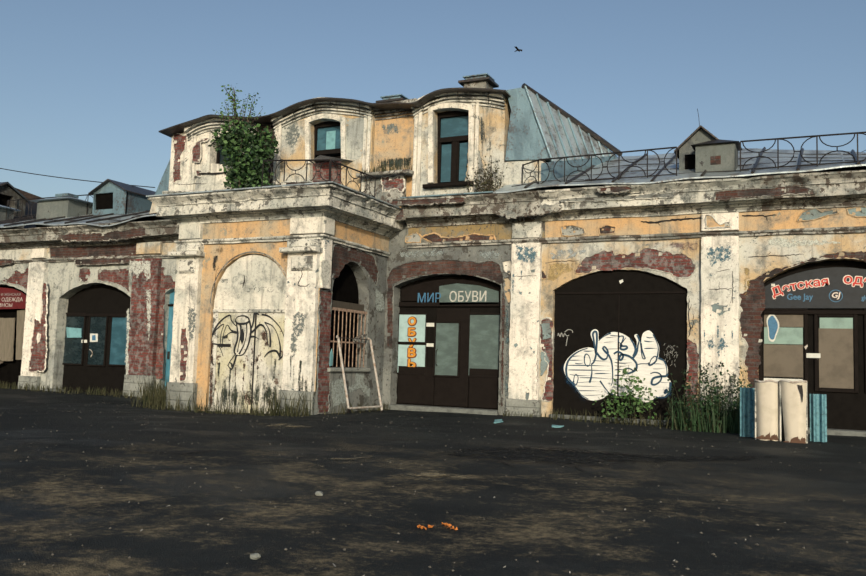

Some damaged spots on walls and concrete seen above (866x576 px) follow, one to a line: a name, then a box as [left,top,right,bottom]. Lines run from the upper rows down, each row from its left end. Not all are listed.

flaking render [172,133,209,184]
flaking render [2,266,29,290]
flaking render [28,282,48,373]
flaking render [49,234,176,380]
flaking render [179,306,197,382]
flaking render [598,224,616,236]
flaking render [530,247,697,281]
flaking render [685,337,701,415]
peeling [707,245,733,276]
flaking render [711,238,866,388]